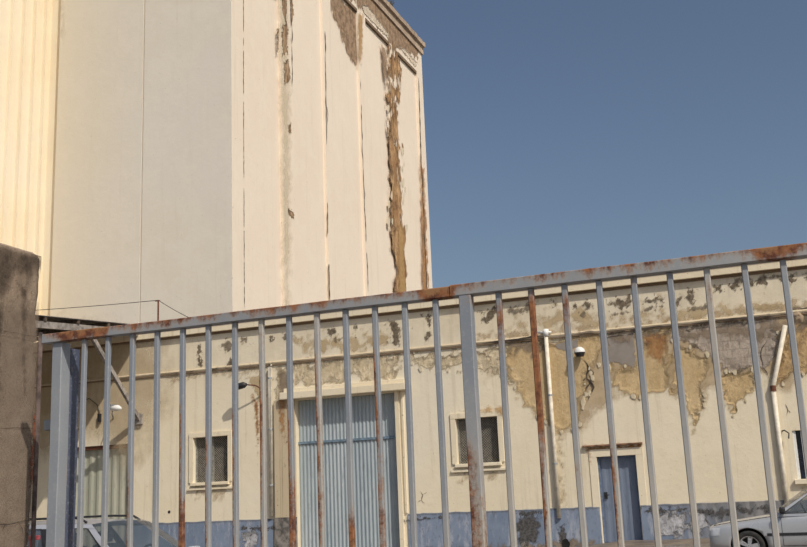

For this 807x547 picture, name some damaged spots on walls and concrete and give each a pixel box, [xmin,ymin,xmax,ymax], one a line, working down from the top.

peeling [276,0,294,83]
peeling [330,0,363,65]
spalling [381,42,408,293]
leakage [0,245,42,291]
leakage [0,307,52,547]
leakage [78,344,154,447]
peeling [275,347,462,400]
crack [582,359,594,400]
peeling [477,307,807,435]
peeling [659,507,712,539]